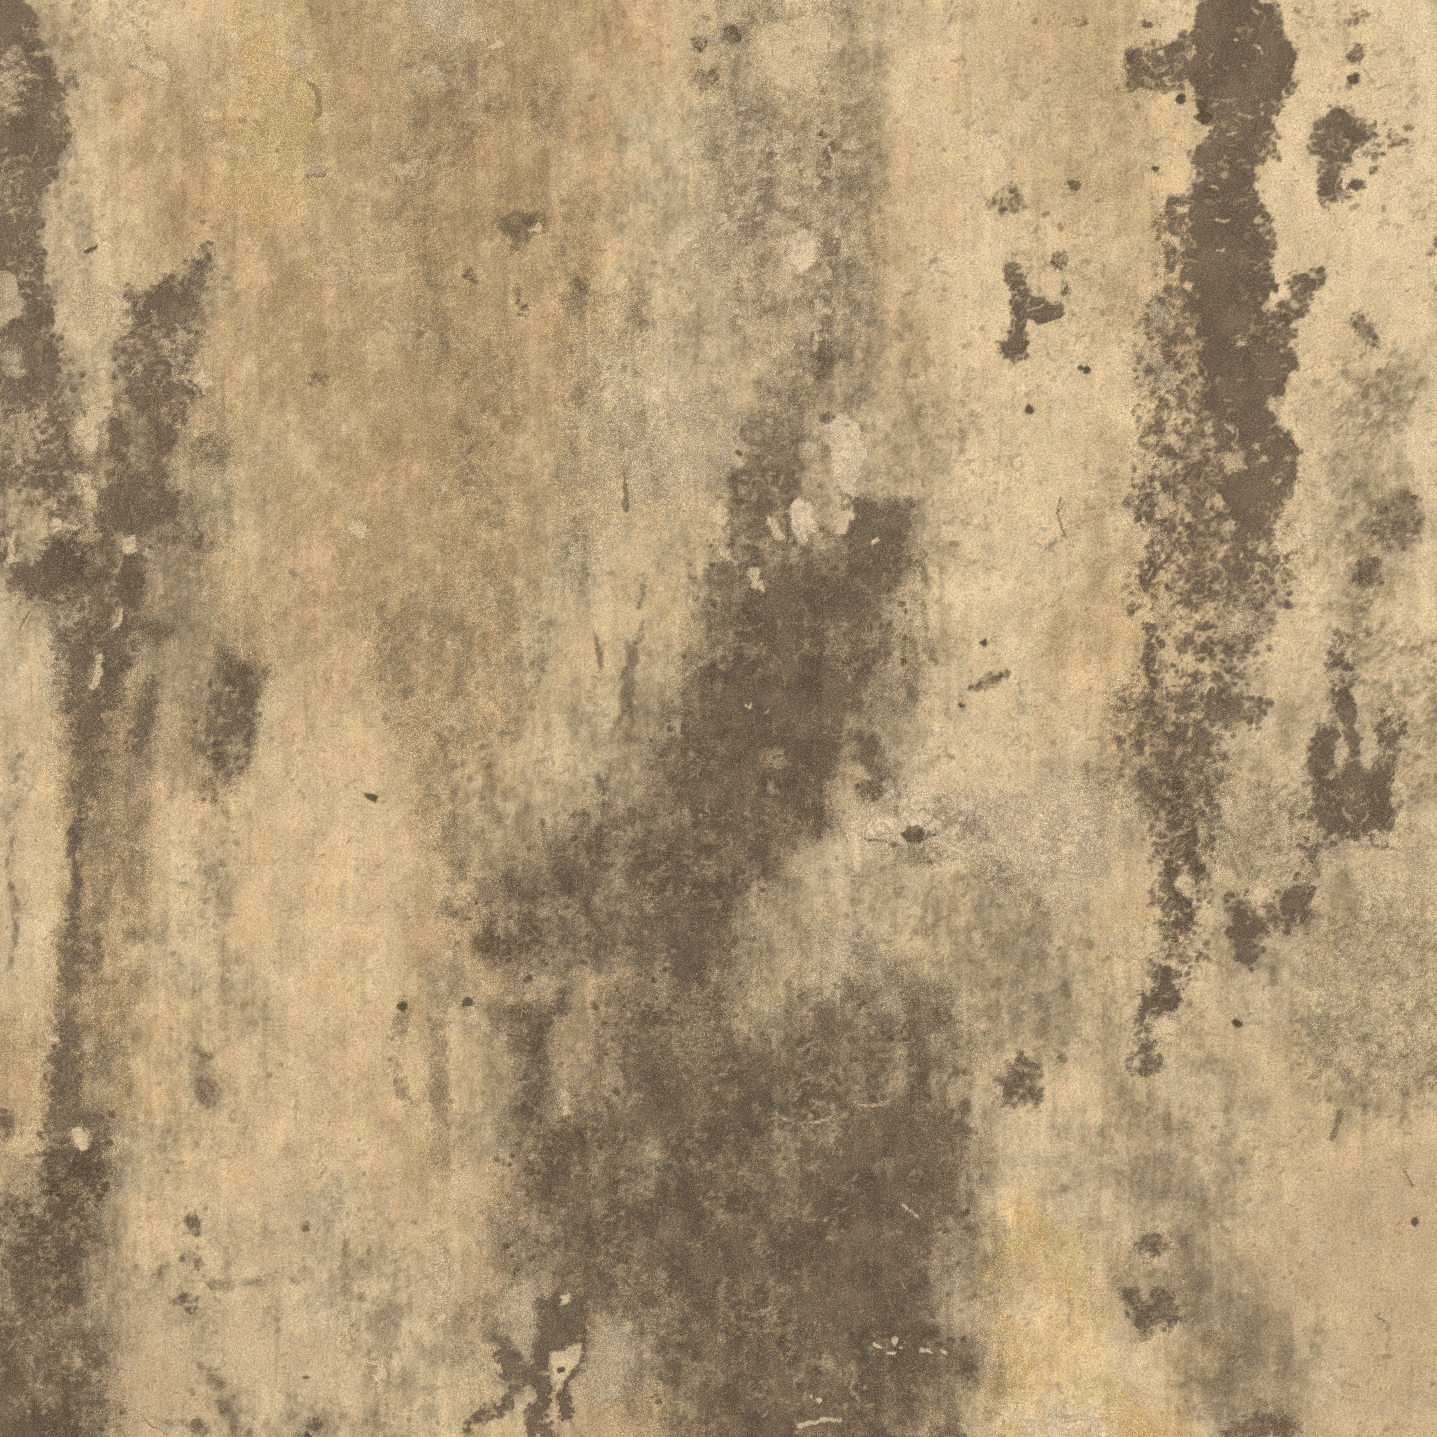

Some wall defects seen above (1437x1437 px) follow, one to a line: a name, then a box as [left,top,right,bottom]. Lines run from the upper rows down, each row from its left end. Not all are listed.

leakage [0,0,213,1437]
leakage [193,658,260,803]
leakage [458,411,1116,1437]
leakage [997,262,1063,361]
leakage [1116,0,1408,1076]